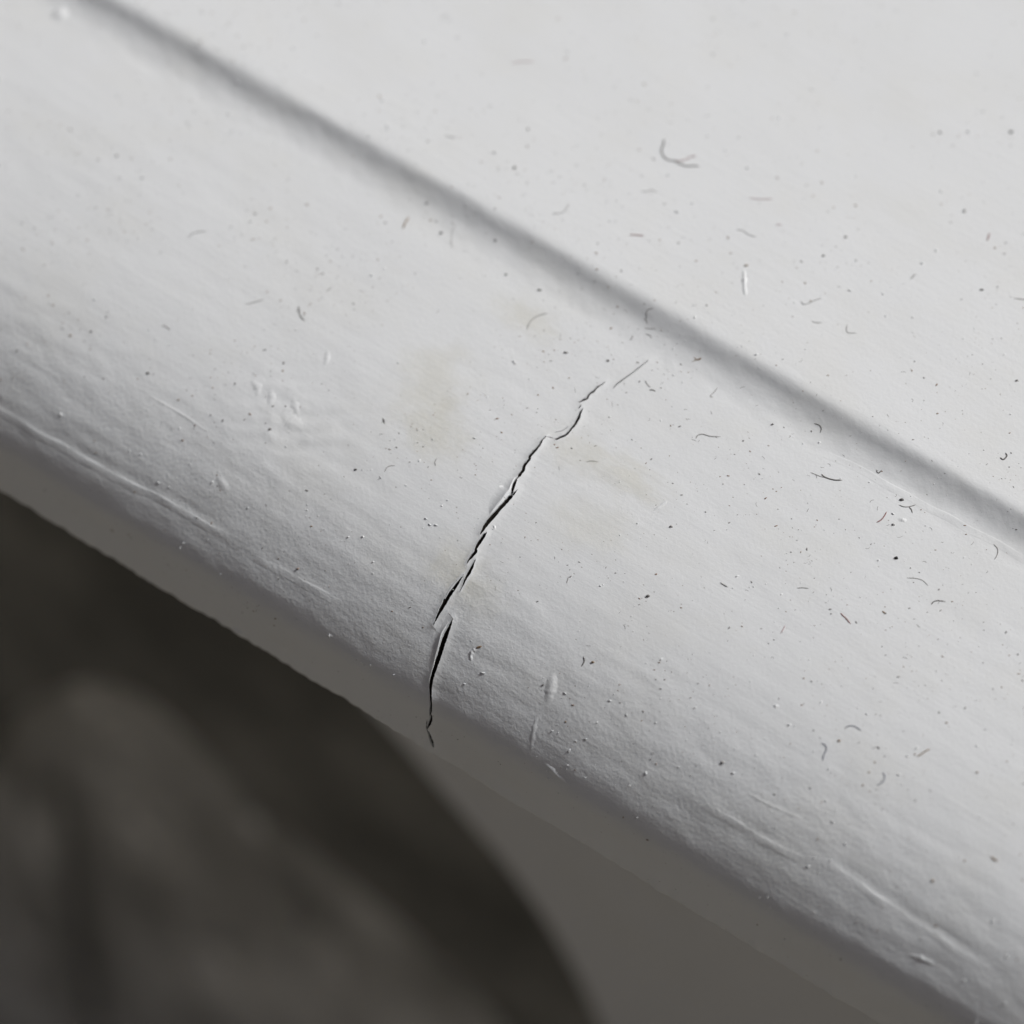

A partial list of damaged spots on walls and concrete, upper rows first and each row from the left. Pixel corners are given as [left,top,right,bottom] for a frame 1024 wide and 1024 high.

crack [427,360,648,746]